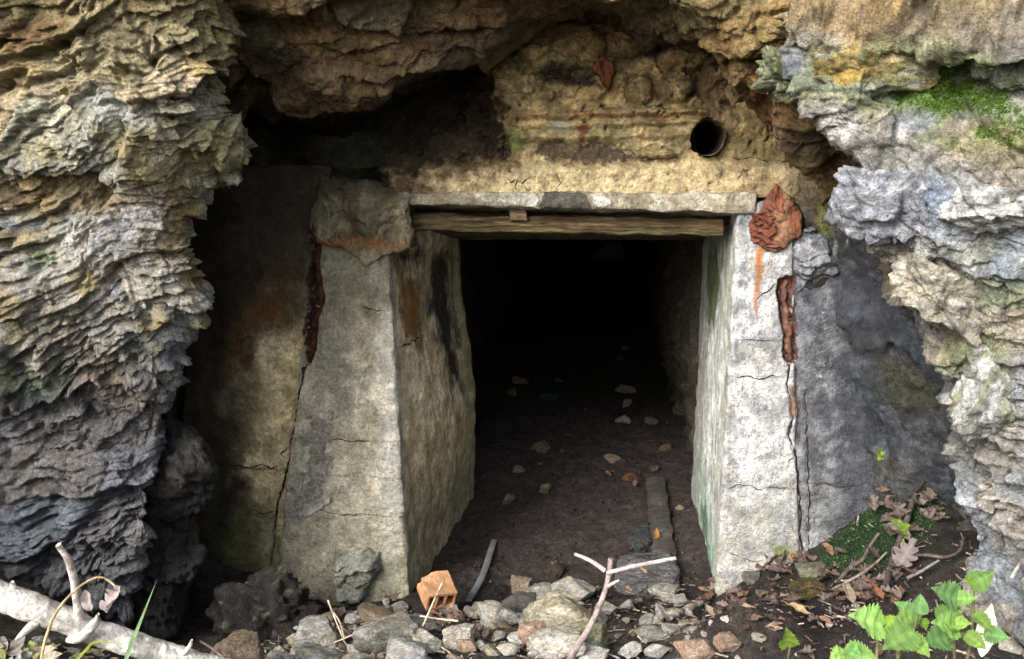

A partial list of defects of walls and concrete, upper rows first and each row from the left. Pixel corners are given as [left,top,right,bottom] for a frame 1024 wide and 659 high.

damp [394,245,463,392]
rust [749,184,801,308]
crack [224,363,309,561]
crack [731,364,866,550]